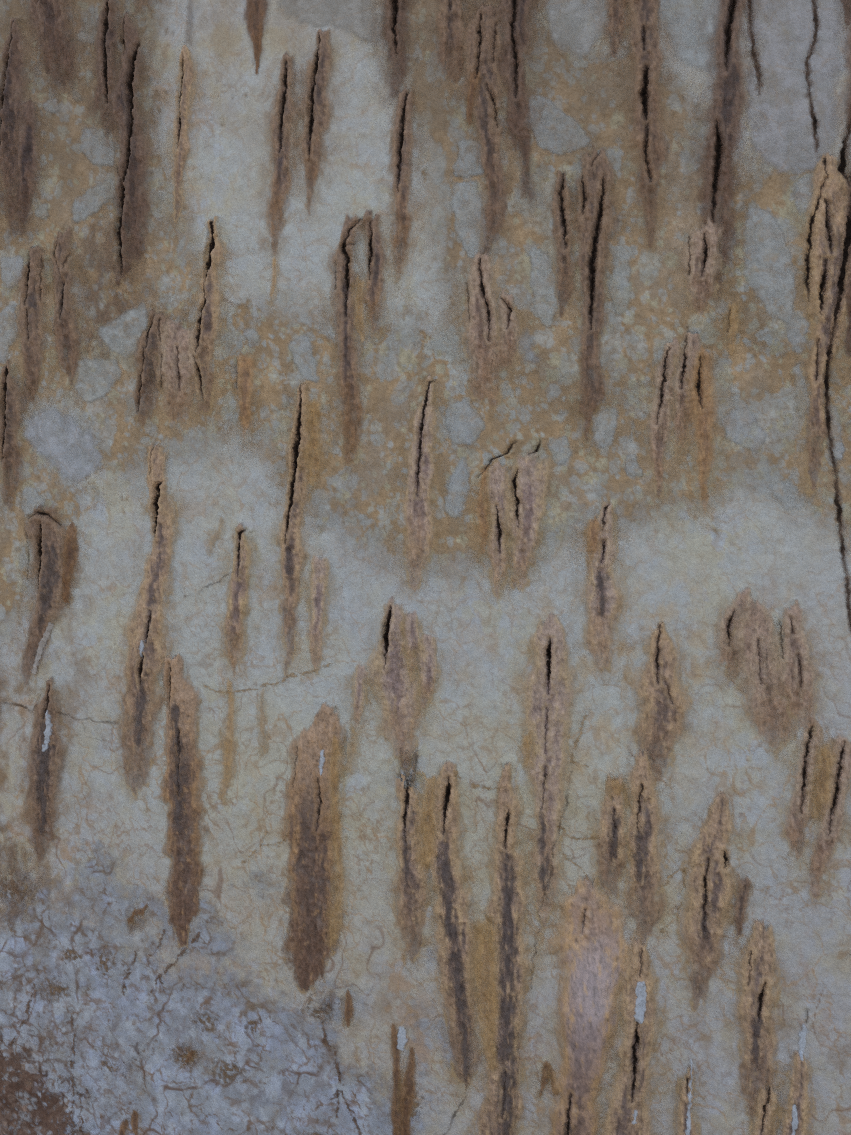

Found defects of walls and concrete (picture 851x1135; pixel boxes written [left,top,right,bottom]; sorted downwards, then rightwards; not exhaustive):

rust [332,0,414,462]
rust [682,0,746,310]
rust [801,153,851,495]
crack [806,0,851,626]
crack [10,970,38,1046]
rust [22,505,79,856]
crack [70,1016,83,1135]
crack [122,929,200,995]
rust [120,444,206,947]
leakage [0,844,394,1135]
crack [319,1016,361,1135]
rust [284,597,692,1135]